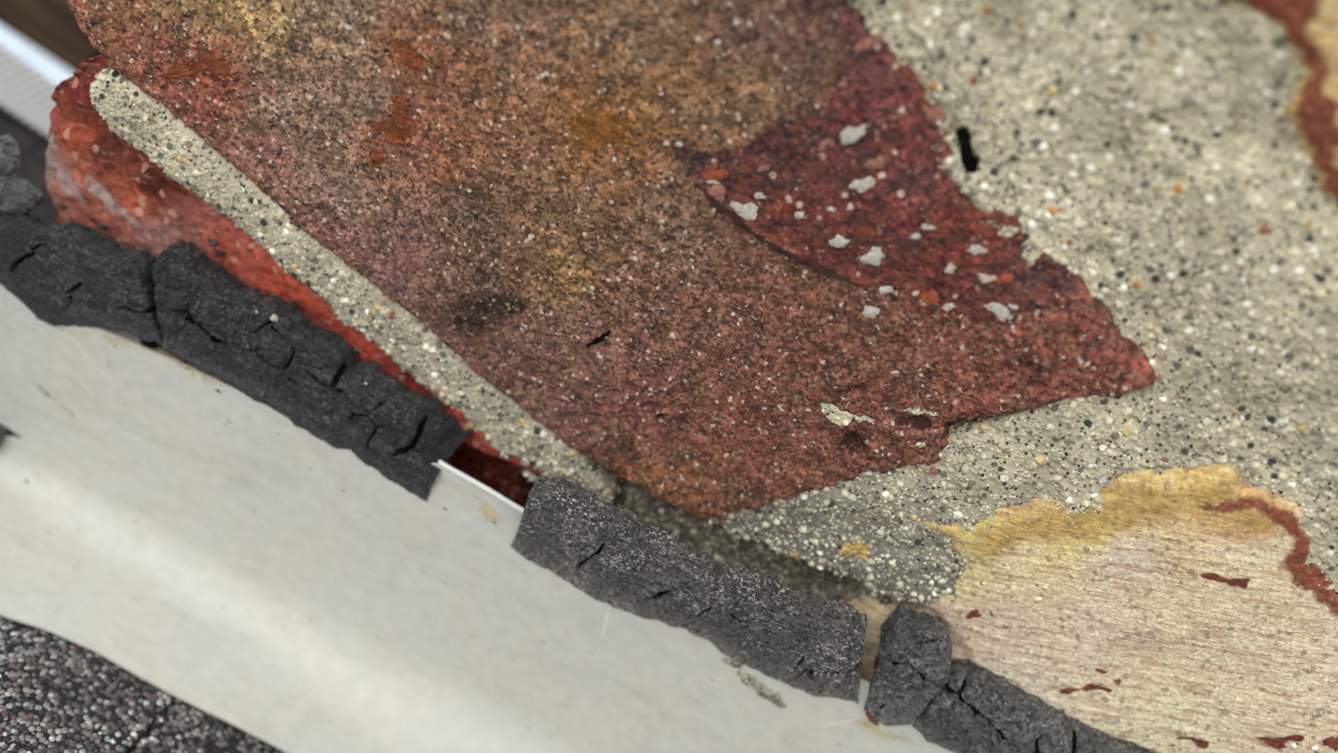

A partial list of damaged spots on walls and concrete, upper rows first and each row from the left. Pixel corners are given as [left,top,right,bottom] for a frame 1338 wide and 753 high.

spalling [663,0,1081,323]
crack [16,243,47,267]
crack [65,284,82,309]
crack [124,306,428,456]
spalling [900,407,939,447]
spalling [844,431,865,452]
crack [557,543,605,566]
crack [797,656,839,674]
crack [891,639,1077,753]